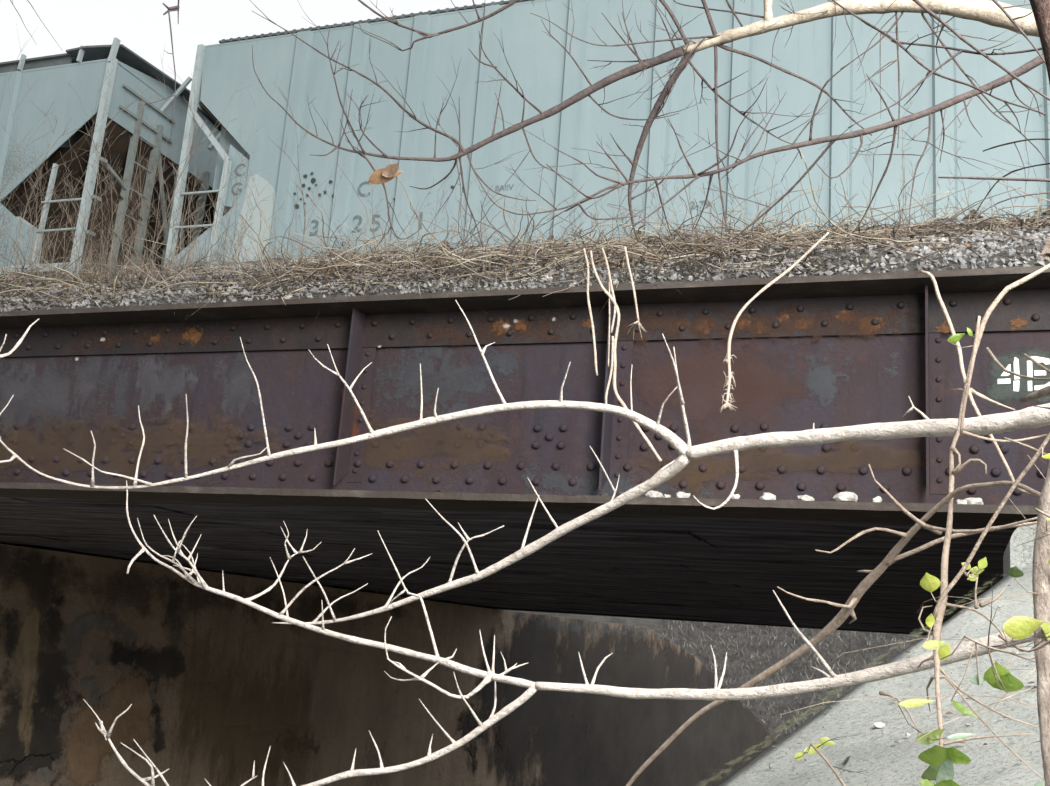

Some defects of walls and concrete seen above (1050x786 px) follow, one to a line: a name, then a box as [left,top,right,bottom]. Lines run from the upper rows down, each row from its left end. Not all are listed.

corrosion [182,326,204,346]
corrosion [731,311,813,334]
corrosion [1011,318,1029,331]
corrosion [642,319,798,433]
damp [299,595,357,622]
damp [0,545,85,786]
damp [108,567,282,753]
damp [456,612,777,786]
damp [368,751,383,786]